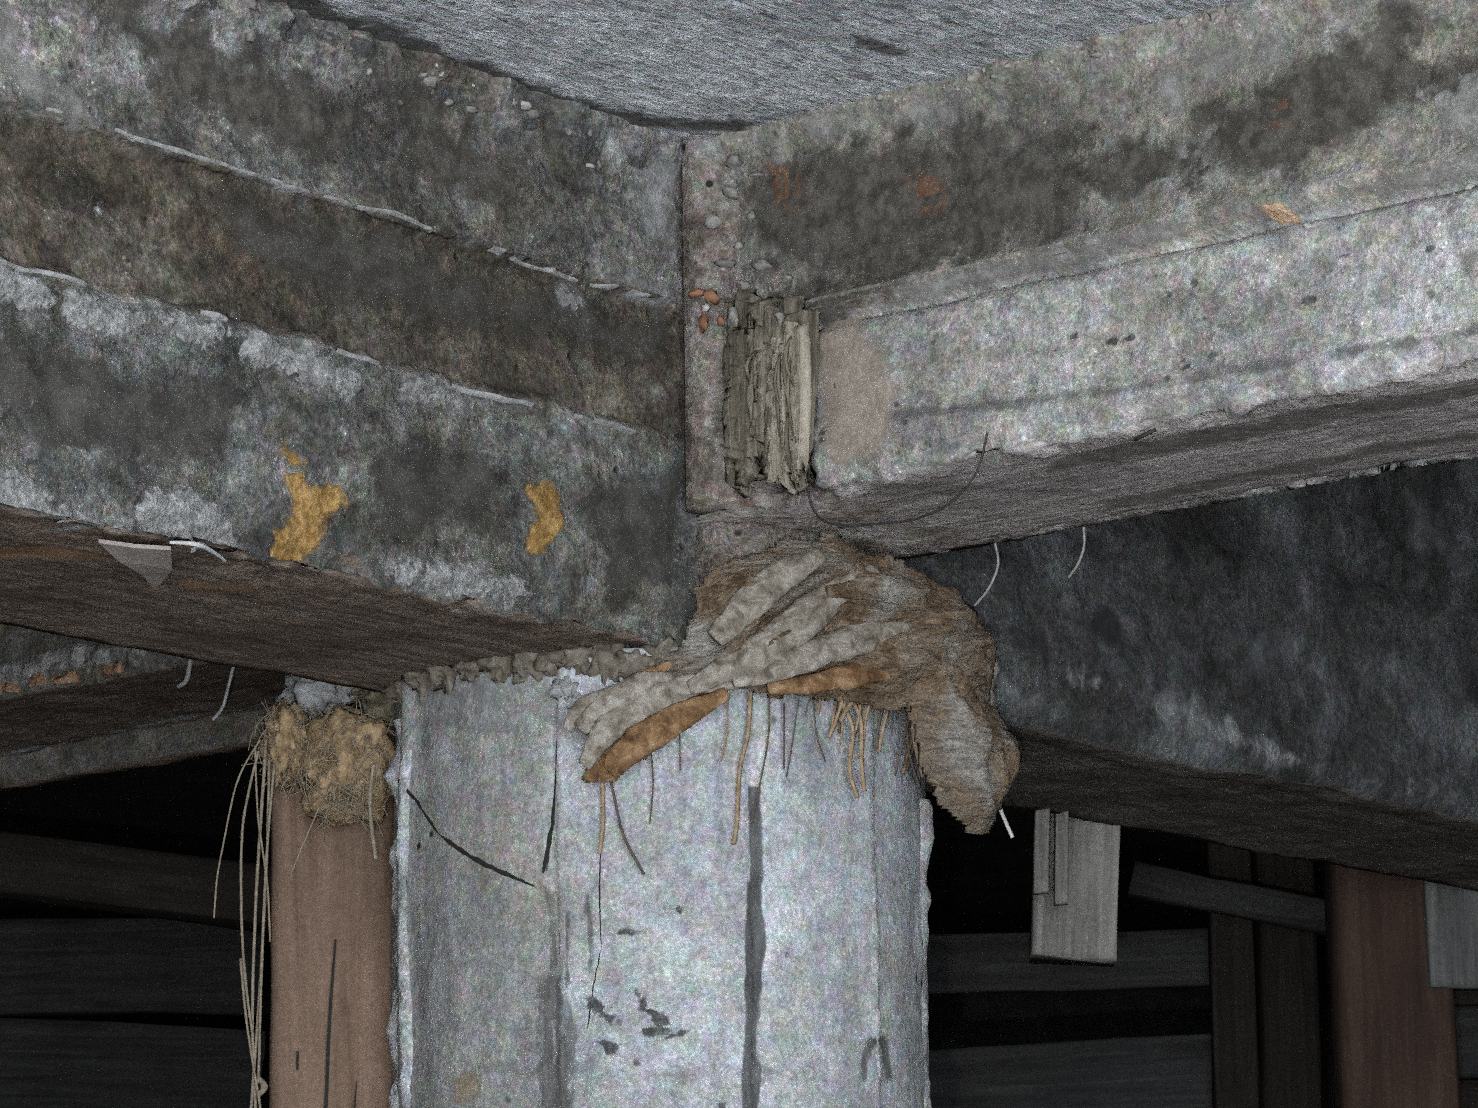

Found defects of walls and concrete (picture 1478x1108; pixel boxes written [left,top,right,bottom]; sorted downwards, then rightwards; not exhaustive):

water stain [0,15,85,131]
water stain [113,0,366,182]
water stain [266,0,773,204]
water stain [637,165,679,239]
water stain [741,2,1478,328]
water stain [3,335,236,462]
rust [270,442,348,568]
water stain [373,450,492,537]
crack [398,741,557,887]